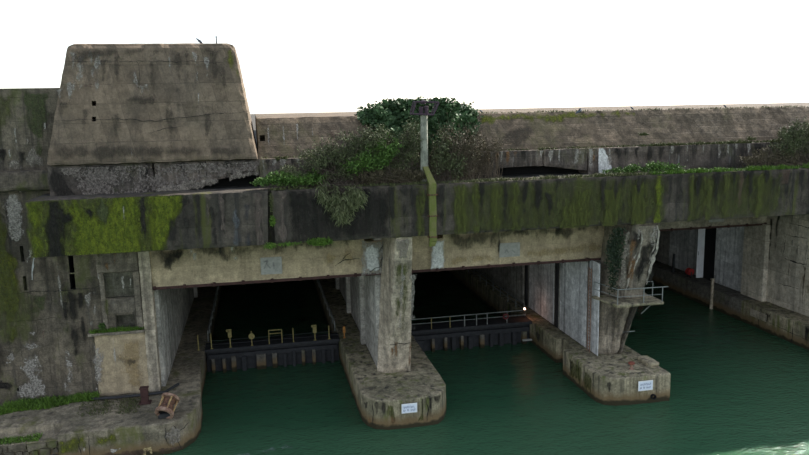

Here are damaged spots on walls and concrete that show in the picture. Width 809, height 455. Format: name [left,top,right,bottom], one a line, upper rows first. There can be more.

water stain [59,51,119,109]
water stain [155,193,264,269]
water stain [273,185,422,262]
water stain [451,179,585,252]
water stain [597,176,655,283]